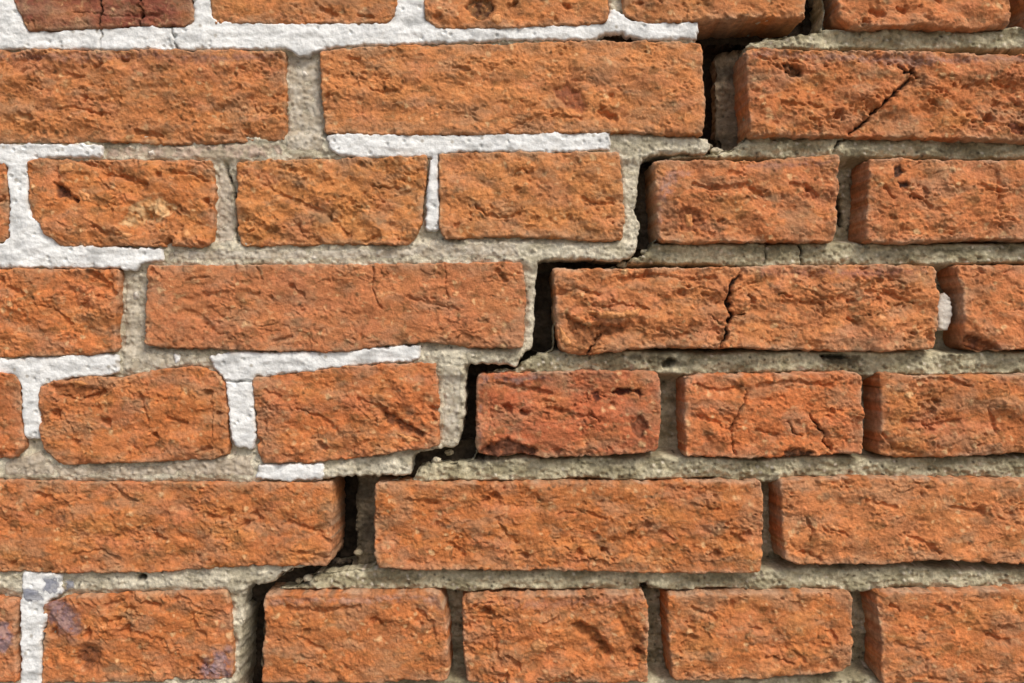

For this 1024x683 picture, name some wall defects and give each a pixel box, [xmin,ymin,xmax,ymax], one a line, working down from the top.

crack [695,0,813,155]
crack [834,68,913,148]
crack [721,275,739,343]
crack [250,161,656,683]